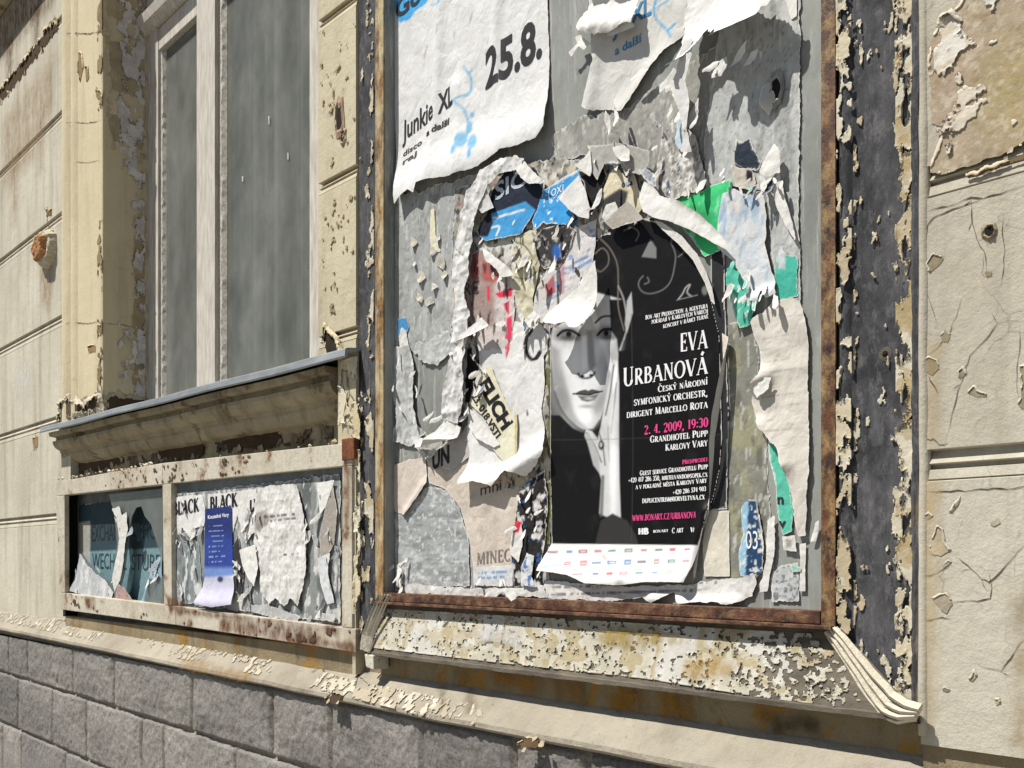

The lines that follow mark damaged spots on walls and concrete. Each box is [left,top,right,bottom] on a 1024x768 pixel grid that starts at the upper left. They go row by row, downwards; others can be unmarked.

flaking render [0,16,58,105]
peeling [927,0,1024,178]
peeling [56,0,148,423]
peeling [321,141,374,291]
crack [926,185,1024,287]
peeling [836,0,913,701]
crack [926,295,1023,445]
peeling [286,289,861,707]
crack [936,485,1024,493]
rust [168,598,354,652]
peeling [309,672,482,725]
crack [926,553,1017,621]